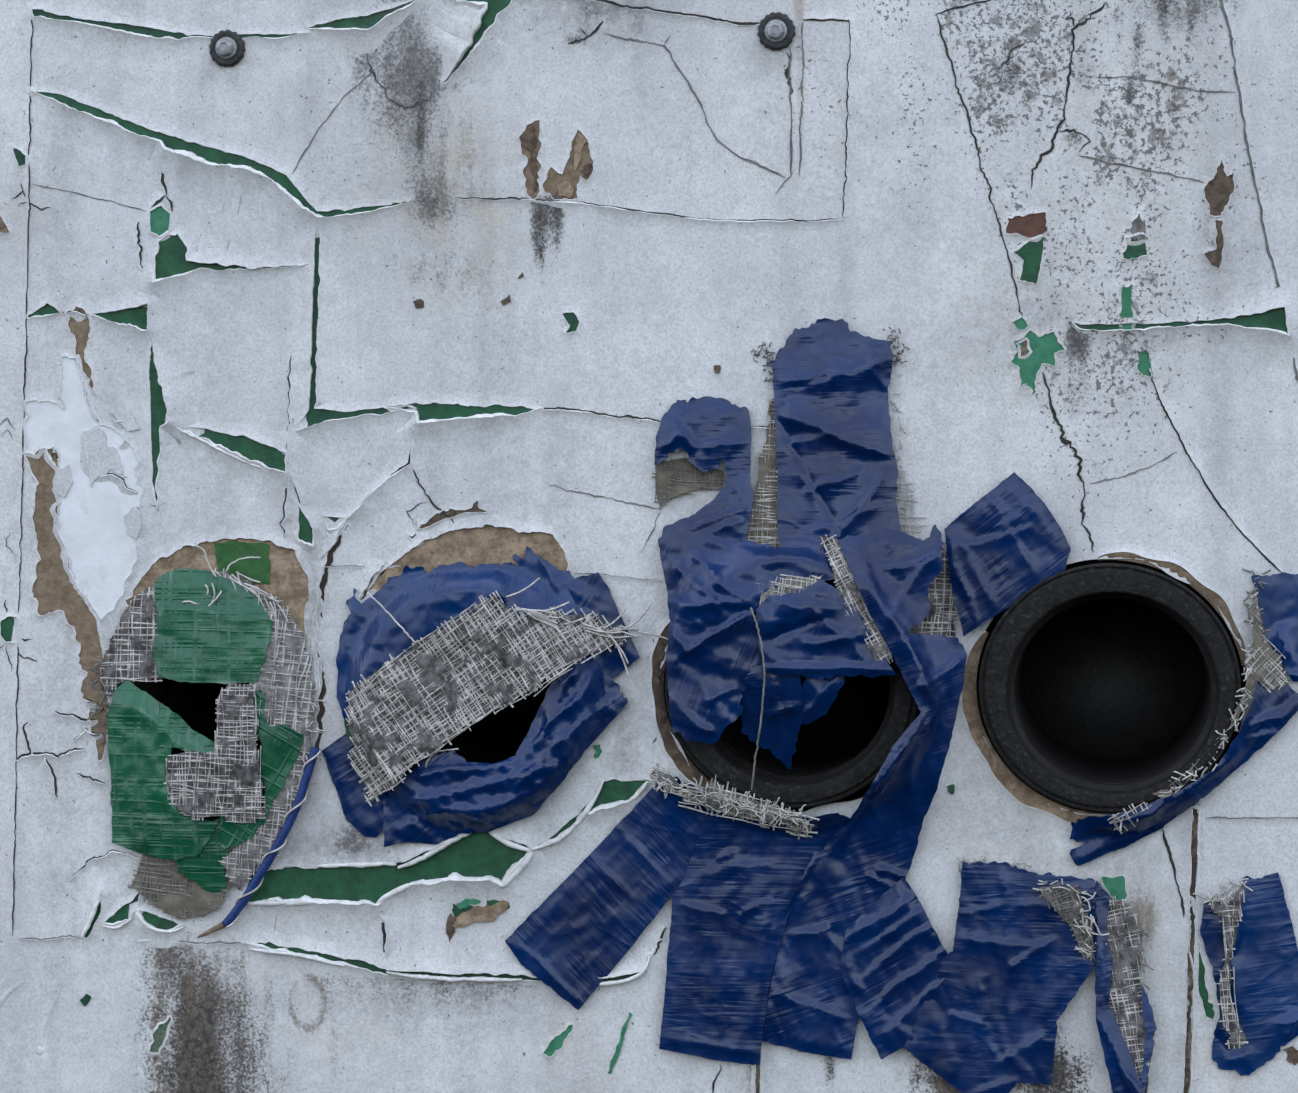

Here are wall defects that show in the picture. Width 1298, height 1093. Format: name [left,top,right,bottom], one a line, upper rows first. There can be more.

peeling [24,0,538,94]
damp [355,0,457,222]
crack [455,0,867,235]
crack [936,0,1023,316]
crack [1030,0,1285,309]
peeling [0,83,545,770]
damp [1066,321,1090,403]
peeling [999,205,1298,403]
crack [1042,368,1286,573]
peeling [229,615,710,993]
damp [141,945,269,1093]
damp [1010,1033,1091,1093]